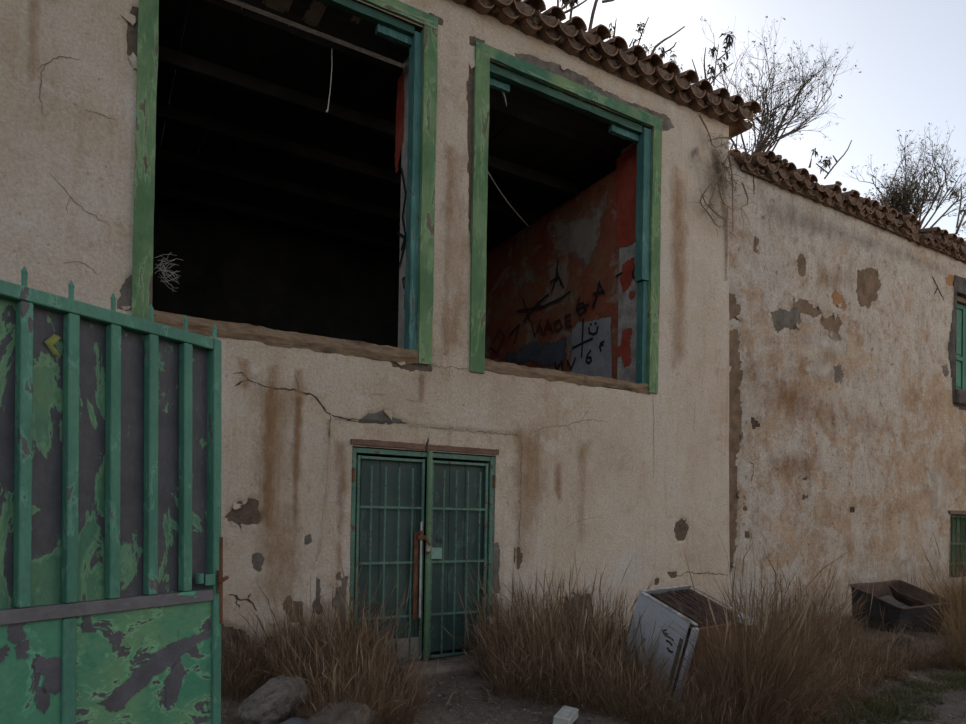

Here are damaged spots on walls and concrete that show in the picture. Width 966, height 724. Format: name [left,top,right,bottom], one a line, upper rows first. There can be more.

spalling [121,6,139,70]
crack [37,56,78,114]
crack [49,173,110,226]
spalling [796,254,806,277]
spalling [770,268,881,342]
crack [233,372,359,438]
spalling [358,409,407,425]
spalling [729,293,760,573]
spalling [224,498,264,533]
spalling [674,518,689,541]
crack [229,594,257,611]